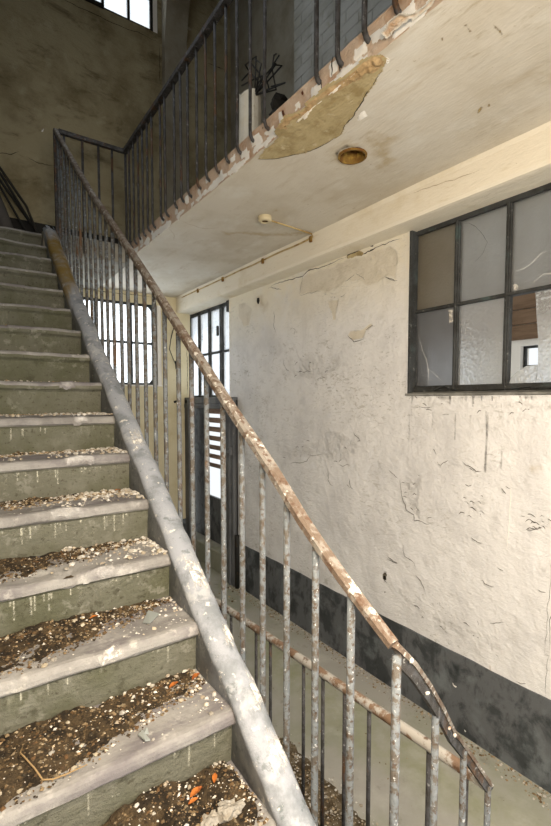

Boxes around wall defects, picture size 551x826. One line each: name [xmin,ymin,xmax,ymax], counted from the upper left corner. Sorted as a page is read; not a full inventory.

spalling [134,0,435,252]
crack [391,472,432,525]
crack [433,449,481,504]